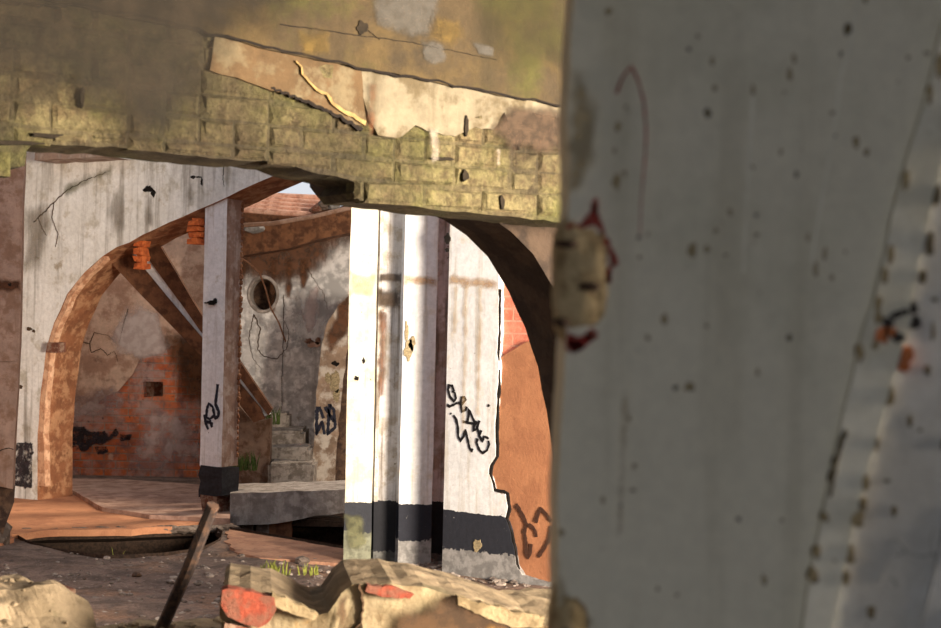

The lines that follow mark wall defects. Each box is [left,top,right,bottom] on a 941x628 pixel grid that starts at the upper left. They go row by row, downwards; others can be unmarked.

flaking render [207,37,367,132]
crack [215,24,560,108]
peeling [476,45,493,55]
peeling [570,87,592,187]
crack [37,172,107,247]
spalling [551,198,618,353]
crack [84,309,128,361]